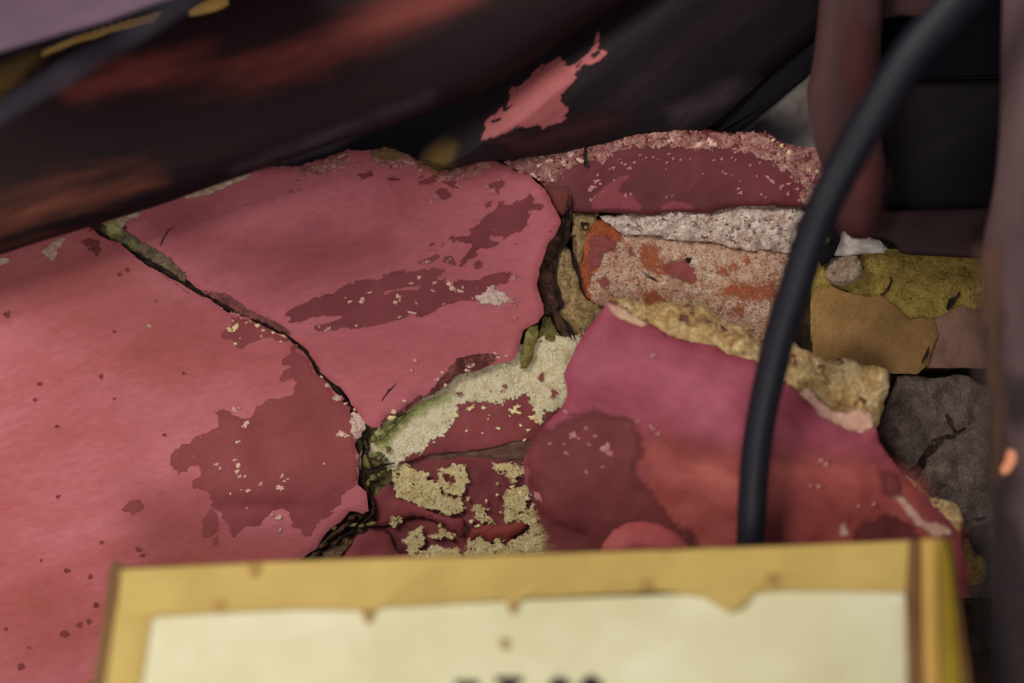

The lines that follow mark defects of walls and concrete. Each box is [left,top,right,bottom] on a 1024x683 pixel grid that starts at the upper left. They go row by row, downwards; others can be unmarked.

peeling [285,114,822,362]
crack [552,196,587,343]
crack [90,223,407,560]
peeling [170,317,366,545]
spalling [380,352,508,426]
peeling [424,409,697,552]
spalling [785,343,890,433]